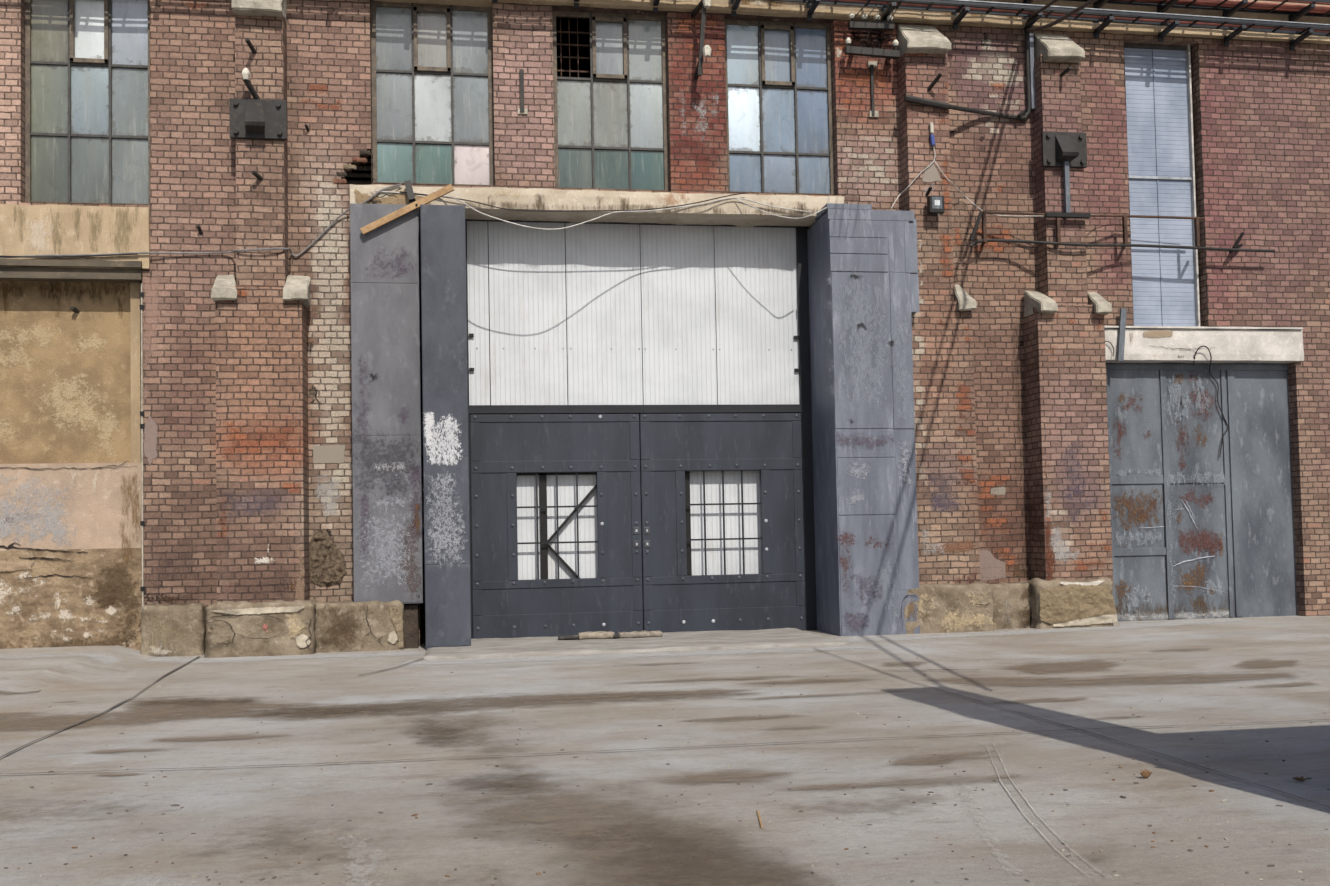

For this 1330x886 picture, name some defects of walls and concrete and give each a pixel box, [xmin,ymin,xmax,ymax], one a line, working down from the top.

spalling [333,150,431,205]
rust [1174,372,1217,470]
rust [1113,489,1162,531]
crack [0,542,93,578]
peeling [0,572,117,642]
rust [838,532,893,631]
rust [1115,580,1149,611]
rust [1177,490,1224,607]